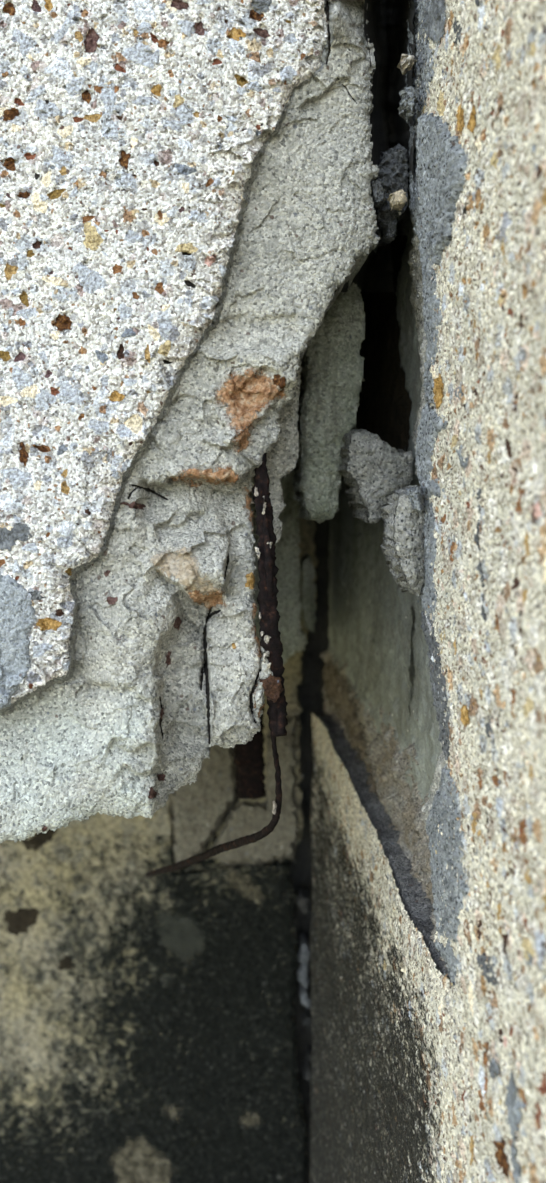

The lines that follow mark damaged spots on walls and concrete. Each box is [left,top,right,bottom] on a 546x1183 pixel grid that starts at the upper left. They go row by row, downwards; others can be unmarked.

crack [324,0,415,191]
crack [335,233,394,292]
spalling [0,0,449,977]
corrosion [215,367,286,453]
crack [200,606,221,744]
corrosion [169,453,288,800]
crack [407,606,415,719]
damp [0,727,441,1183]